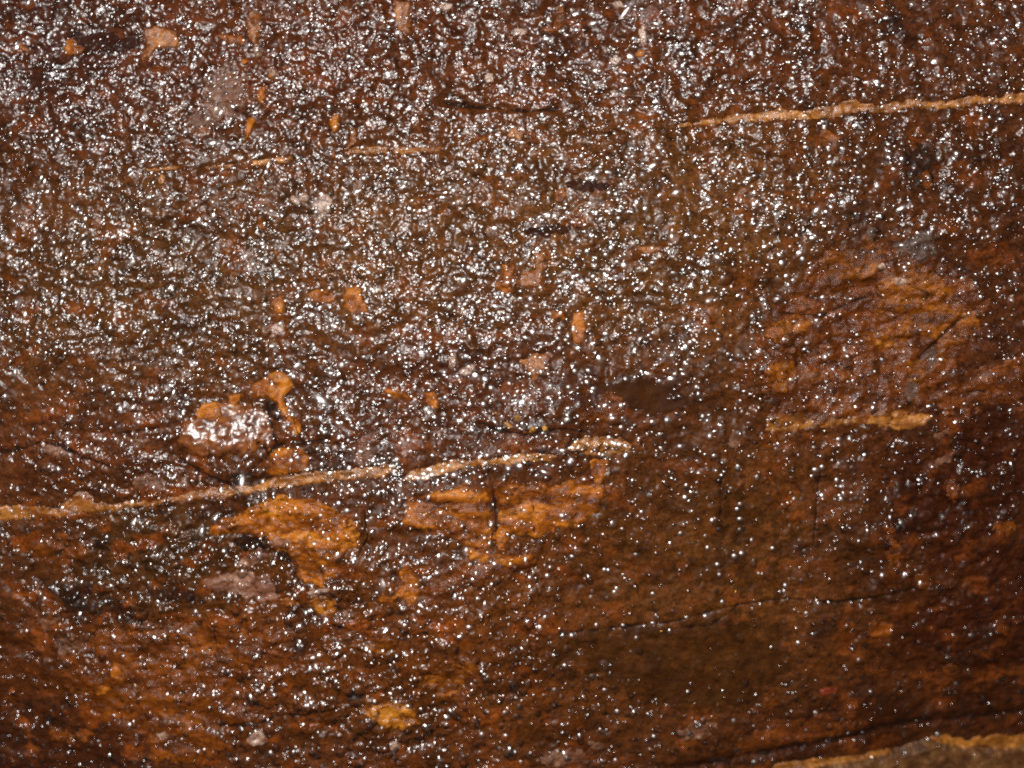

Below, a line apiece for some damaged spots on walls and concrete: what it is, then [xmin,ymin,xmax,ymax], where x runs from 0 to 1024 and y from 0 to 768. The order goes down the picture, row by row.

corrosion [501,431,573,456]
corrosion [398,544,544,611]